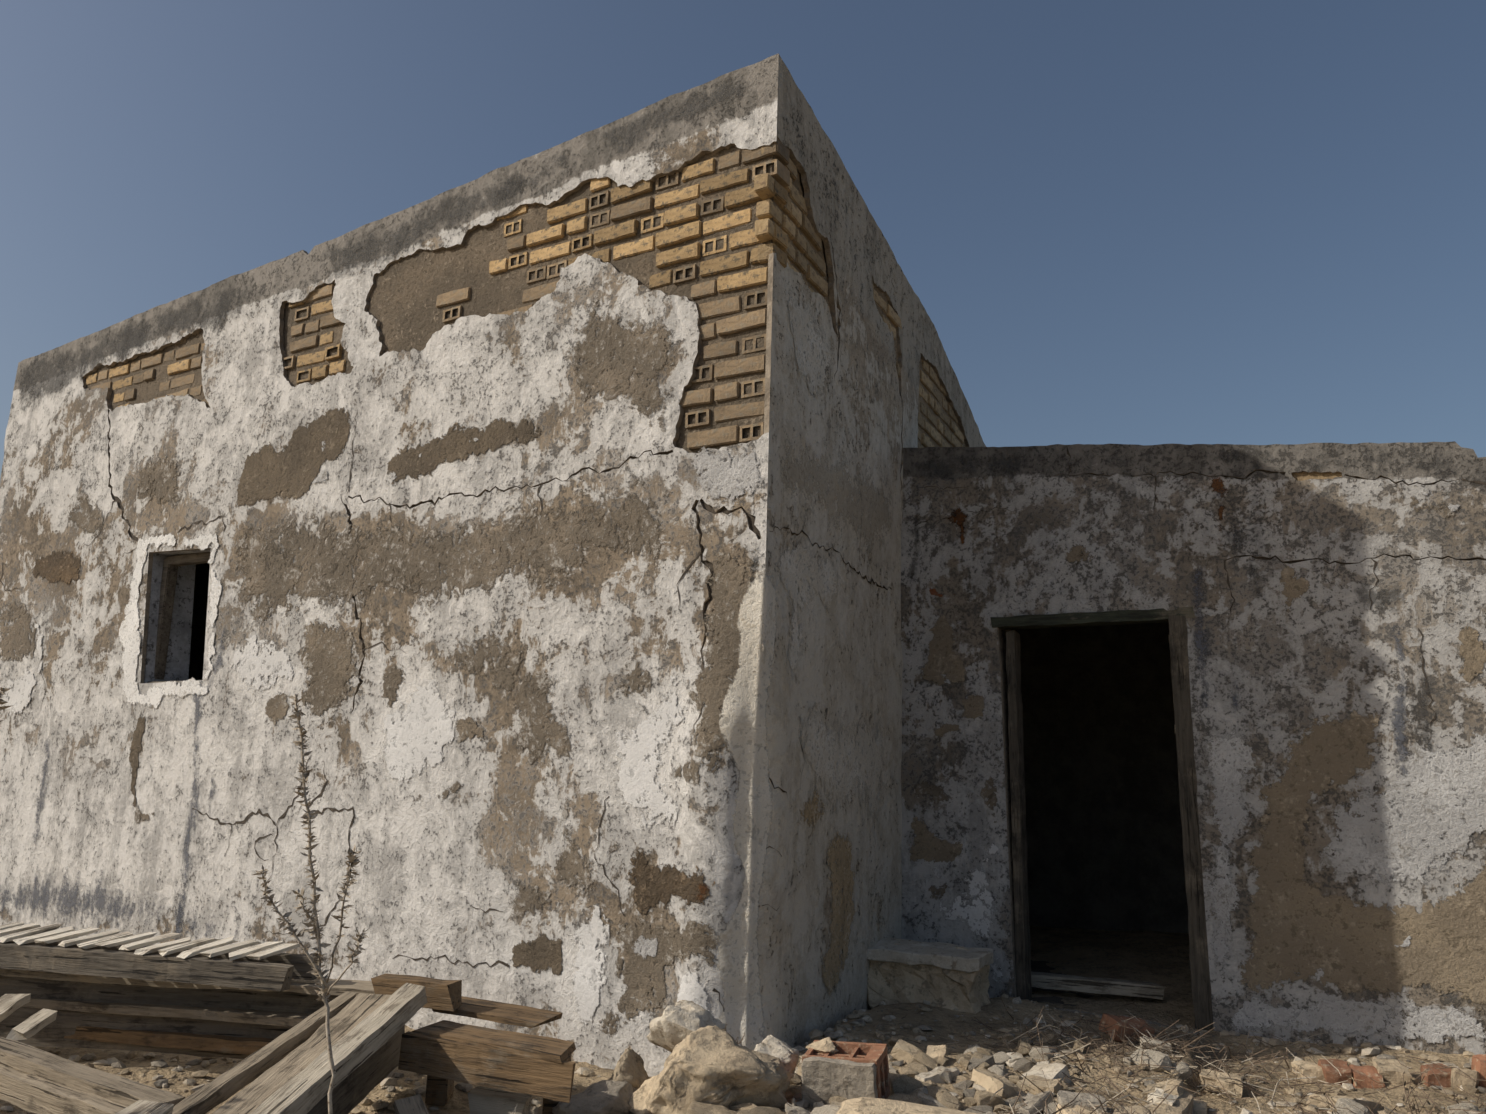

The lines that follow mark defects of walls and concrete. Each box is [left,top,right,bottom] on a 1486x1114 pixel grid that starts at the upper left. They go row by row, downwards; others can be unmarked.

flaking render [85,330,210,410]
flaking render [283,283,354,387]
flaking render [367,138,831,453]
flaking render [873,285,966,448]
crack [321,414,673,687]
crack [677,500,891,730]
rust [947,501,968,545]